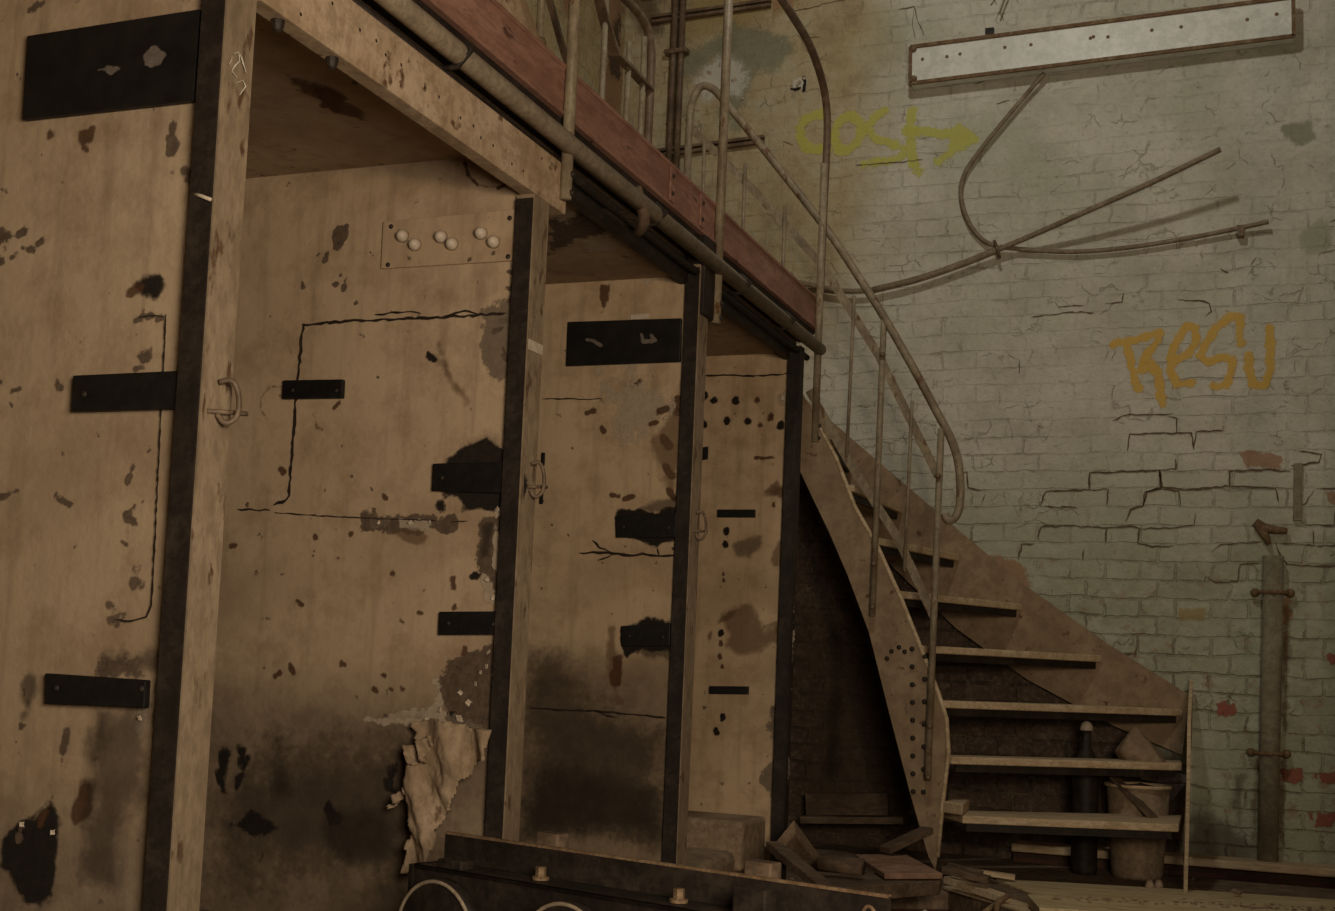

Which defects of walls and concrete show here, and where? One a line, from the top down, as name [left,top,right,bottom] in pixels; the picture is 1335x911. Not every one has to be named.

crack [580,540,674,561]
crack [1018,413,1335,583]
peeling [386,640,494,874]